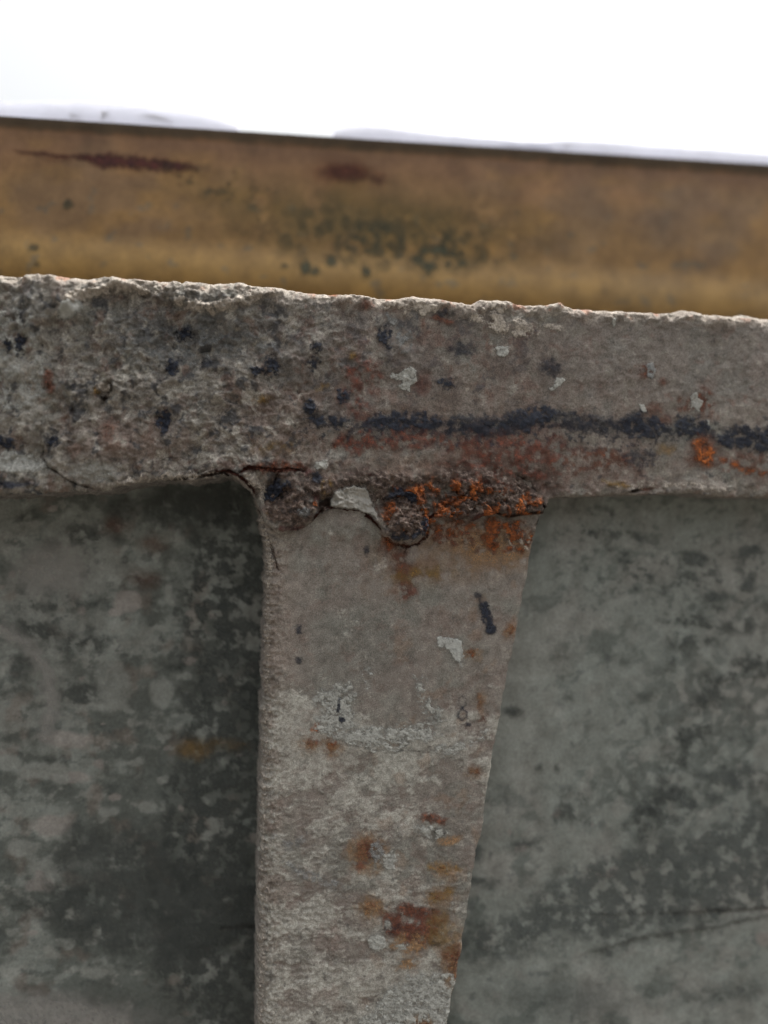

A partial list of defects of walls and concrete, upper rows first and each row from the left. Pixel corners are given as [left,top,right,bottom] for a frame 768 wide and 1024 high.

crack [166,457,303,569]
corrosion [246,354,632,598]
corrosion [692,437,767,476]
water stain [474,593,496,635]
water stain [0,621,102,741]
water stain [44,483,264,1024]
water stain [677,656,768,764]
corrosion [364,862,461,982]
corrosion [416,814,459,845]
water stain [463,766,768,958]